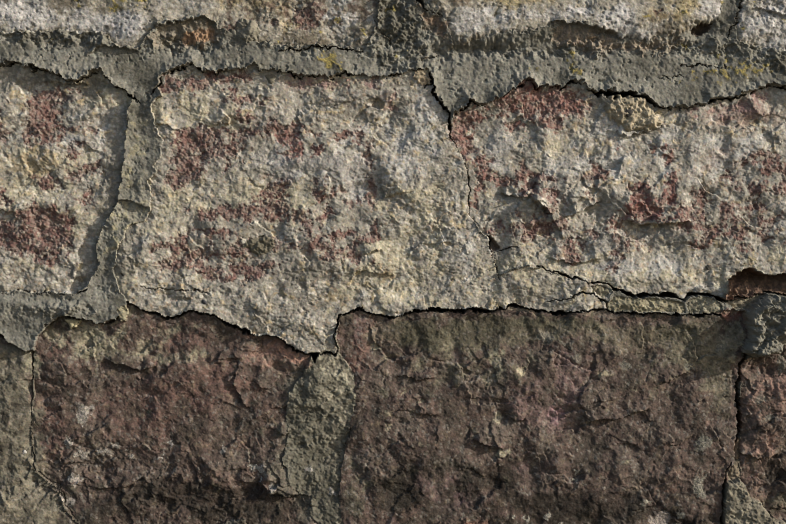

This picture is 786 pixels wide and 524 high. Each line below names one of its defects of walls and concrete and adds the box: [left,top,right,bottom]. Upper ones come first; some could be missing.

crack [0,61,225,104]
crack [278,44,364,81]
crack [503,79,786,111]
crack [658,63,727,80]
crack [387,55,519,280]
peeling [117,305,129,322]
crack [43,265,786,357]
spalling [719,268,786,323]
spalling [236,331,313,369]
crack [734,351,754,443]
spalling [728,438,741,484]
crack [720,462,732,524]